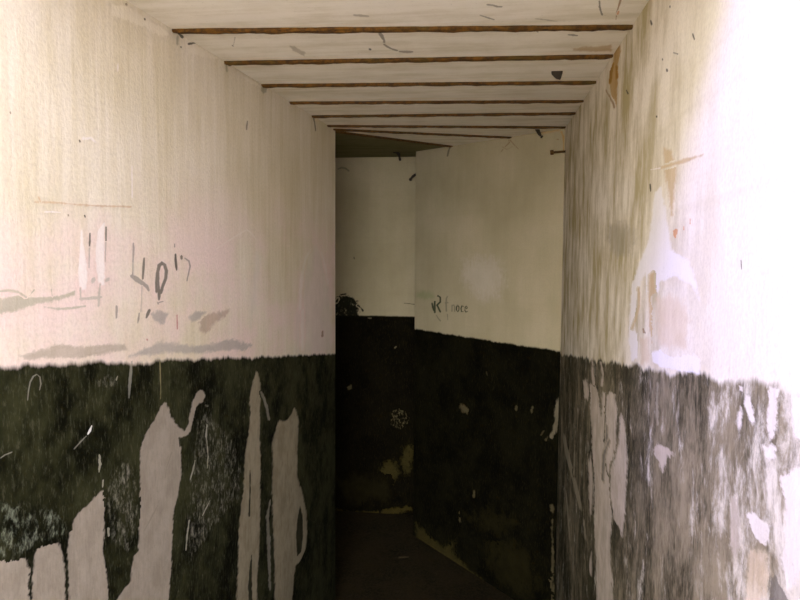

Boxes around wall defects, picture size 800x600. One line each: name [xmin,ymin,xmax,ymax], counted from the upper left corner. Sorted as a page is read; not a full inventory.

damp [602,144,706,377]
peeling [0,369,308,600]
peeling [539,357,630,600]
peeling [653,441,675,476]
peeling [727,463,800,600]
peeling [733,384,800,463]